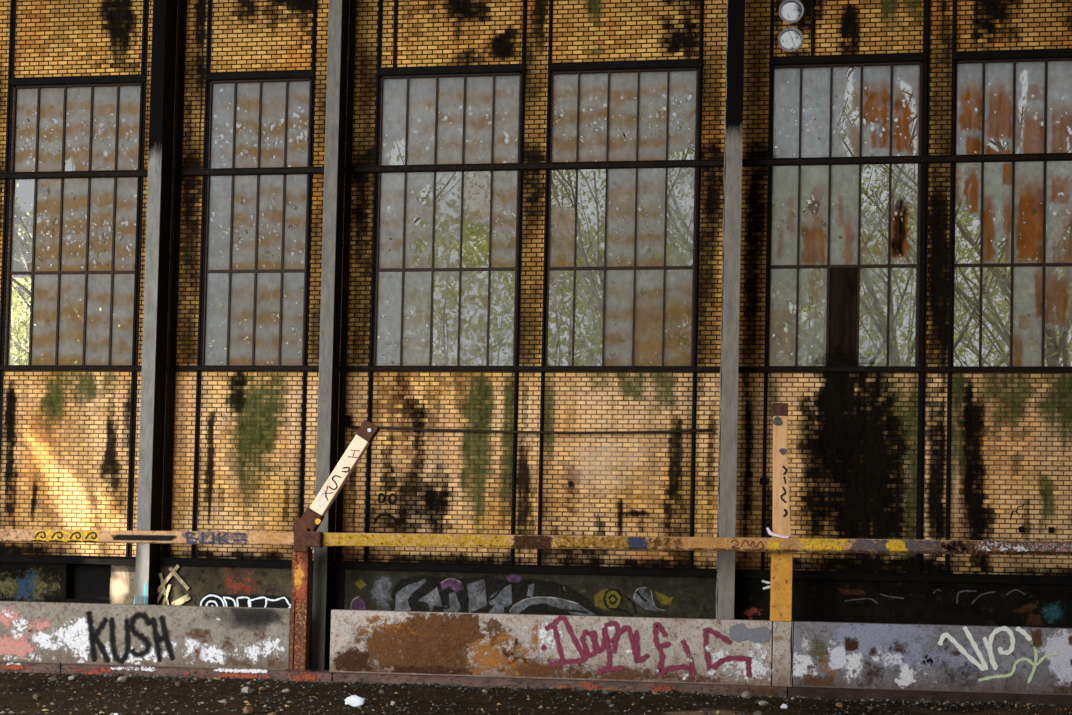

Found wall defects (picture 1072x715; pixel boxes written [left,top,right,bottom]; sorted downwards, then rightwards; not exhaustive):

water stain [496,0,549,65]
water stain [4,381,18,529]
water stain [65,371,131,492]
water stain [225,371,247,416]
water stain [376,437,404,533]
water stain [395,371,426,469]
water stain [426,486,450,534]
water stain [796,349,906,539]
water stain [925,373,996,540]
peeling [0,605,322,682]
corrosion [333,612,719,692]
peeling [1033,629,1072,688]